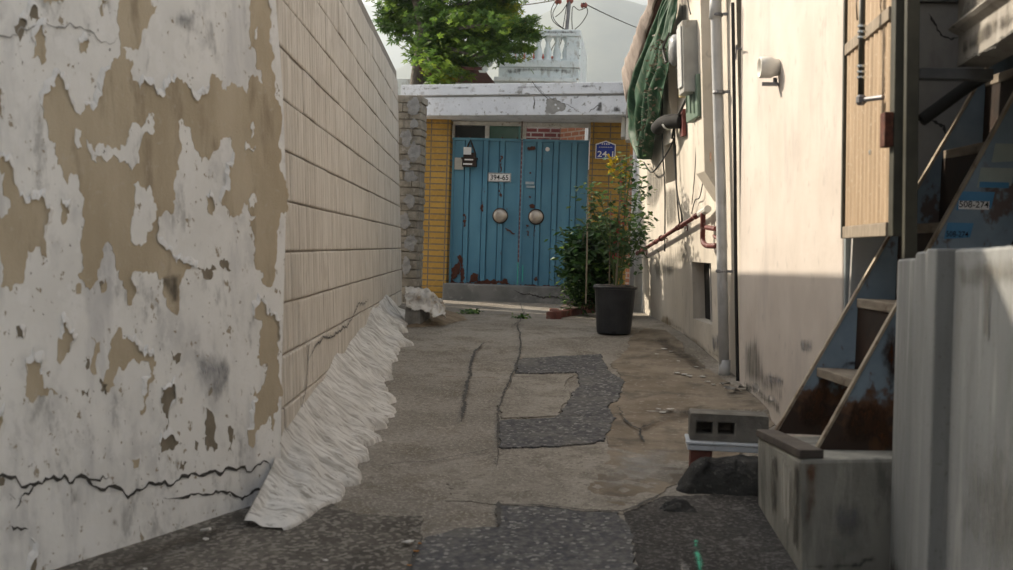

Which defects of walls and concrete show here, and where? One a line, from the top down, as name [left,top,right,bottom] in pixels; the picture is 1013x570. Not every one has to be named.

crack [0,23,116,45]
peeling [0,0,289,452]
corrosion [450,255,562,287]
crack [0,460,271,531]
damp [771,459,814,544]